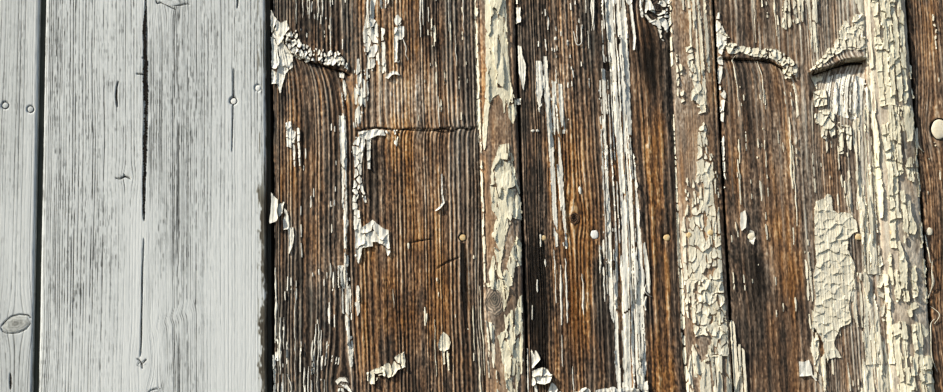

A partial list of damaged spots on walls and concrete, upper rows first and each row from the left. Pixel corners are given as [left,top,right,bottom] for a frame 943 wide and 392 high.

crack [116,0,184,392]
peeling [273,327,292,392]
peeling [269,0,409,384]
crack [359,126,475,134]
peeling [438,332,451,370]
peeling [459,0,799,392]
peeling [761,0,940,392]